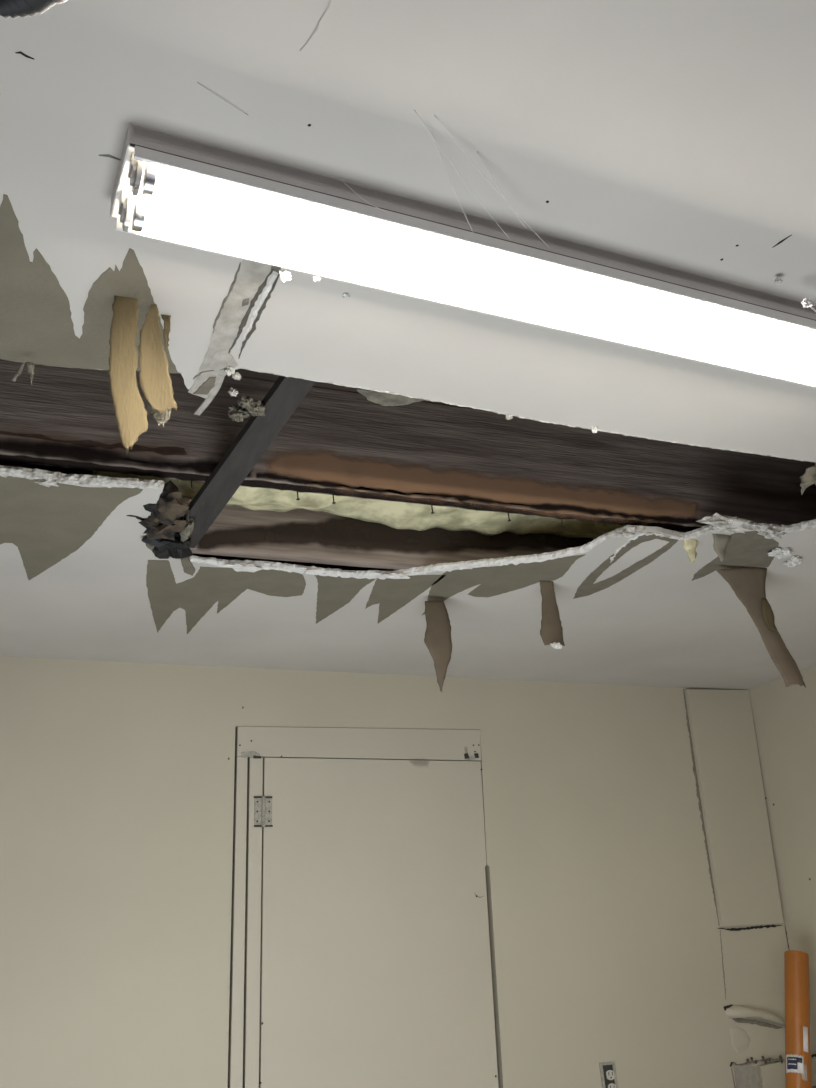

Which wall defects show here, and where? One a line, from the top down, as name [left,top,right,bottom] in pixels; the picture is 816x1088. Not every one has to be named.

peeling [238,265,281,349]
spalling [240,368,810,462]
spalling [0,465,164,489]
spalling [190,525,723,580]
spalling [750,519,816,533]
crack [683,689,790,999]
crack [730,1055,784,1088]
flaking render [733,1061,785,1088]